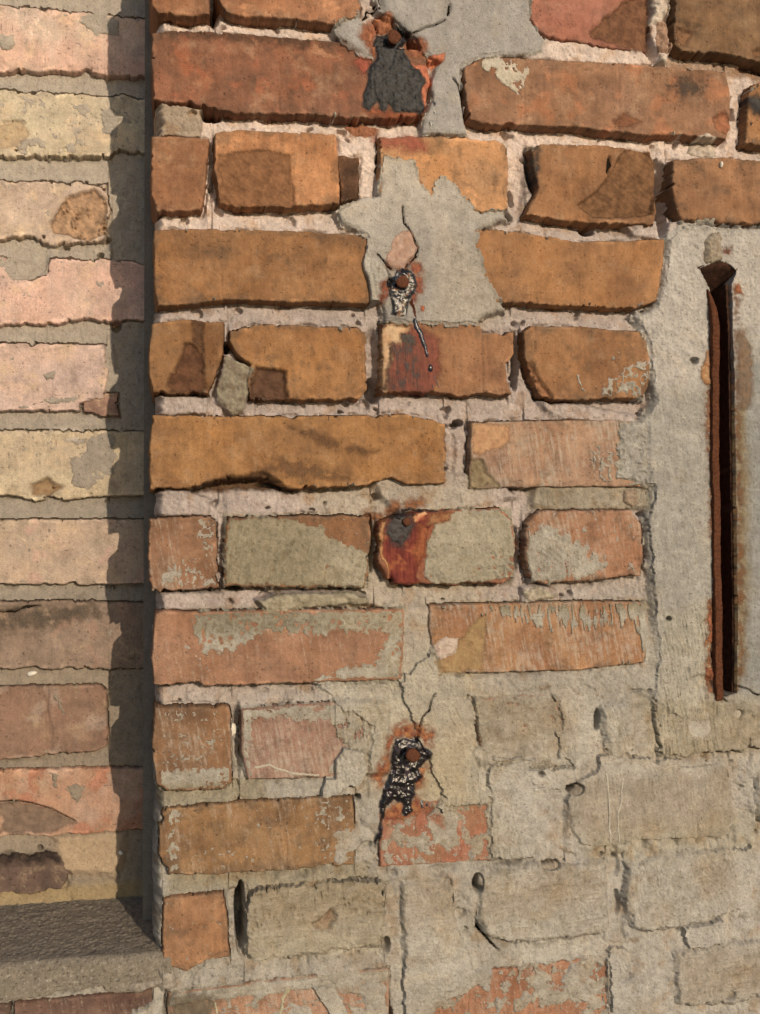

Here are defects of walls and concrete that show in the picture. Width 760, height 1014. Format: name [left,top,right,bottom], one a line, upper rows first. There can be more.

corrosion [354,20,445,151]
peeling [362,244,388,307]
corrosion [377,231,441,397]
corrosion [701,350,711,459]
corrosion [365,499,451,585]
spalling [436,616,486,673]
corrosion [704,599,714,693]
corrosion [371,724,443,847]